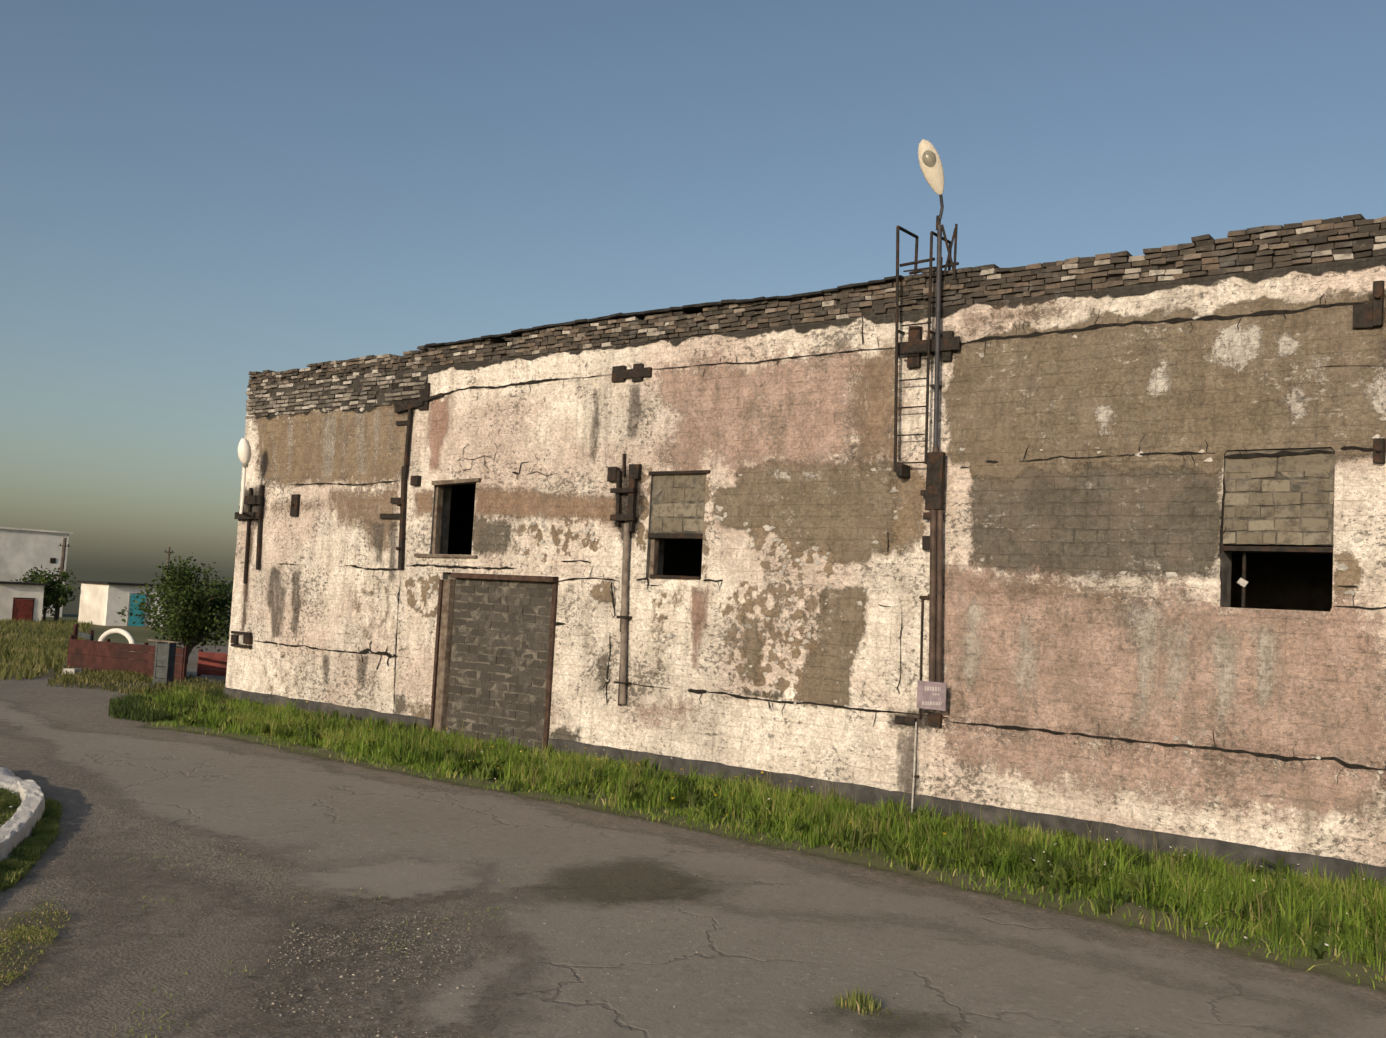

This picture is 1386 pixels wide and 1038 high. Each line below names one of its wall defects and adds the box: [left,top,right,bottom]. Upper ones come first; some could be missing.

crack [960,294,1365,348]
flaking render [245,256,1386,583]
water stain [267,568,300,637]
water stain [273,484,433,637]
water stain [357,656,367,686]
crack [253,559,513,710]
crack [556,555,903,725]
flaking render [701,457,899,708]
crack [961,435,1373,581]
spalling [1332,537,1364,603]
crack [1335,585,1386,613]
crack [948,721,1386,784]